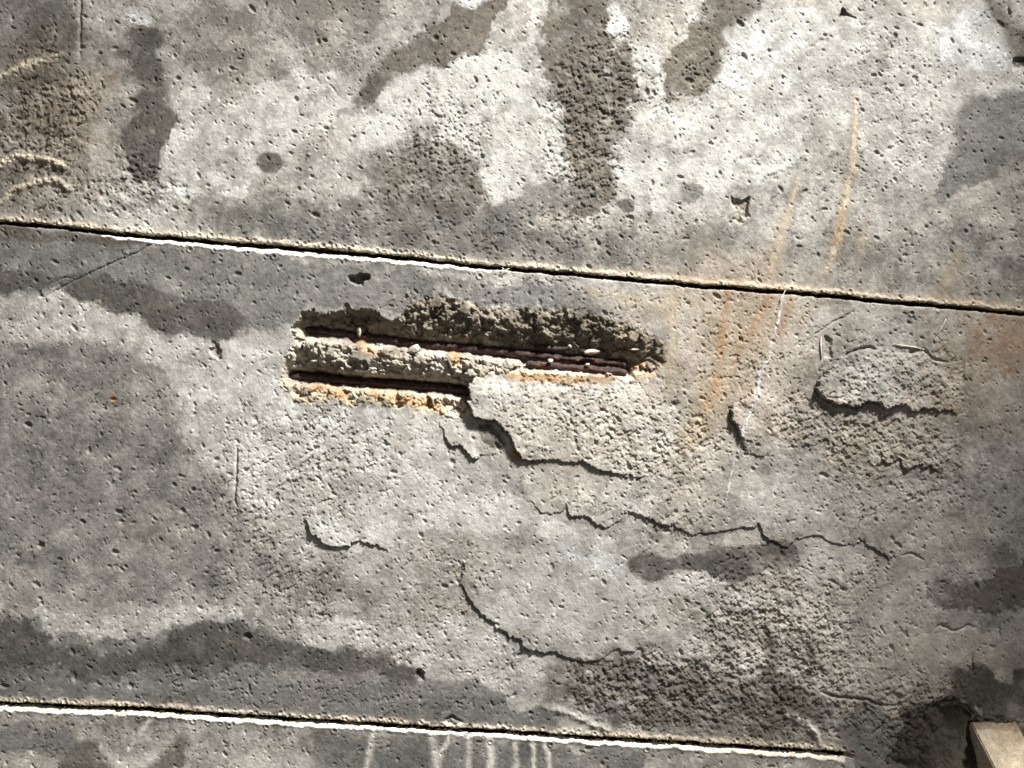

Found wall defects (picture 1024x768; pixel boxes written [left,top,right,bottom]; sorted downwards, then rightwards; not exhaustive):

water stain [119,0,1024,259]
corrosion [768,179,799,273]
corrosion [822,92,859,274]
crack [438,419,482,460]
spalling [278,294,667,460]
water stain [0,225,1024,768]
crack [465,376,651,479]
crack [526,501,925,562]
corrosion [682,291,790,446]
crack [726,296,784,500]
crack [813,345,957,417]
crack [459,552,659,677]